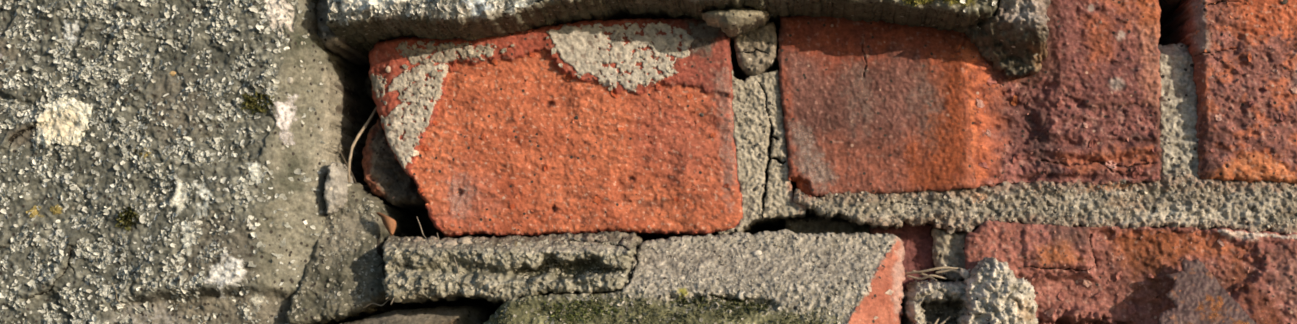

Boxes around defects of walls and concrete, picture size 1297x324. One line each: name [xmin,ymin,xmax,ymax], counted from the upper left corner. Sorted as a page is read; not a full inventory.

crack [718,49,809,235]